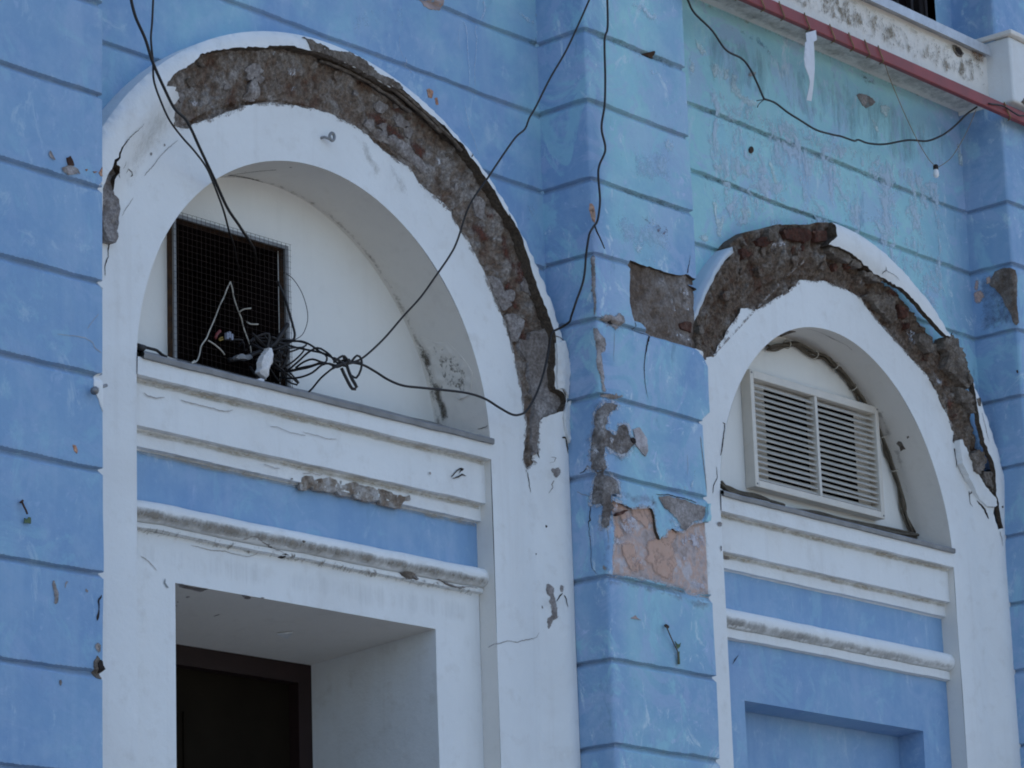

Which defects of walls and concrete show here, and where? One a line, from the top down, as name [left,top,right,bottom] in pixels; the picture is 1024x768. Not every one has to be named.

spalling [49,151,133,266]
spalling [167,37,571,472]
flaking render [974,268,1019,325]
spalling [628,222,997,514]
flaking render [586,256,725,598]
flaking render [290,476,411,509]
peeling [542,584,568,629]